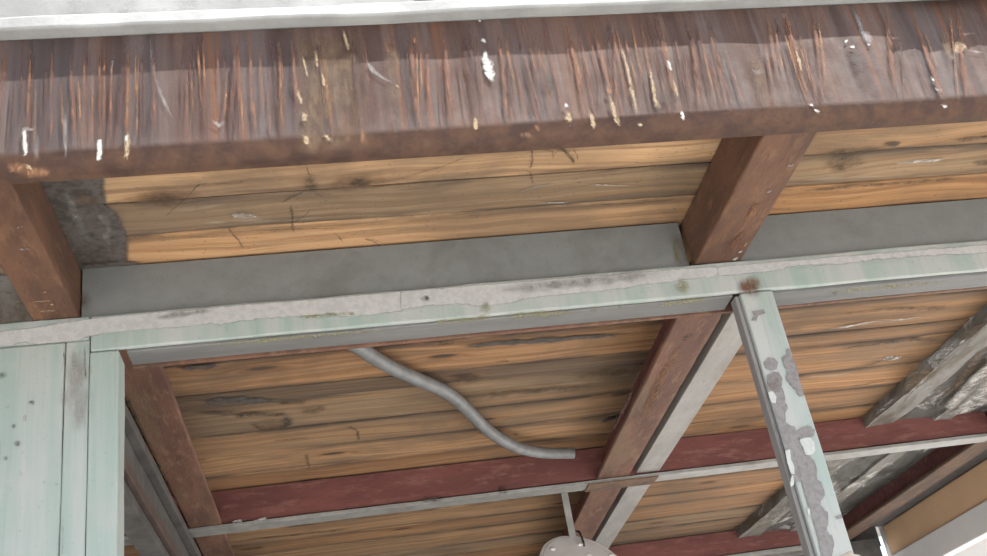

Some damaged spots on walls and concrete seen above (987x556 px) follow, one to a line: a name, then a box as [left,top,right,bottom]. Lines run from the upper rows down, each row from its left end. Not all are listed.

rust [10,55,156,175]
rust [216,31,368,145]
rust [387,38,484,130]
rust [498,29,572,122]
rust [567,28,742,128]
rust [765,18,826,93]
rust [918,29,942,92]
damp [40,178,142,273]
rust [741,279,760,293]
damp [933,352,987,413]
peeling [764,348,860,556]